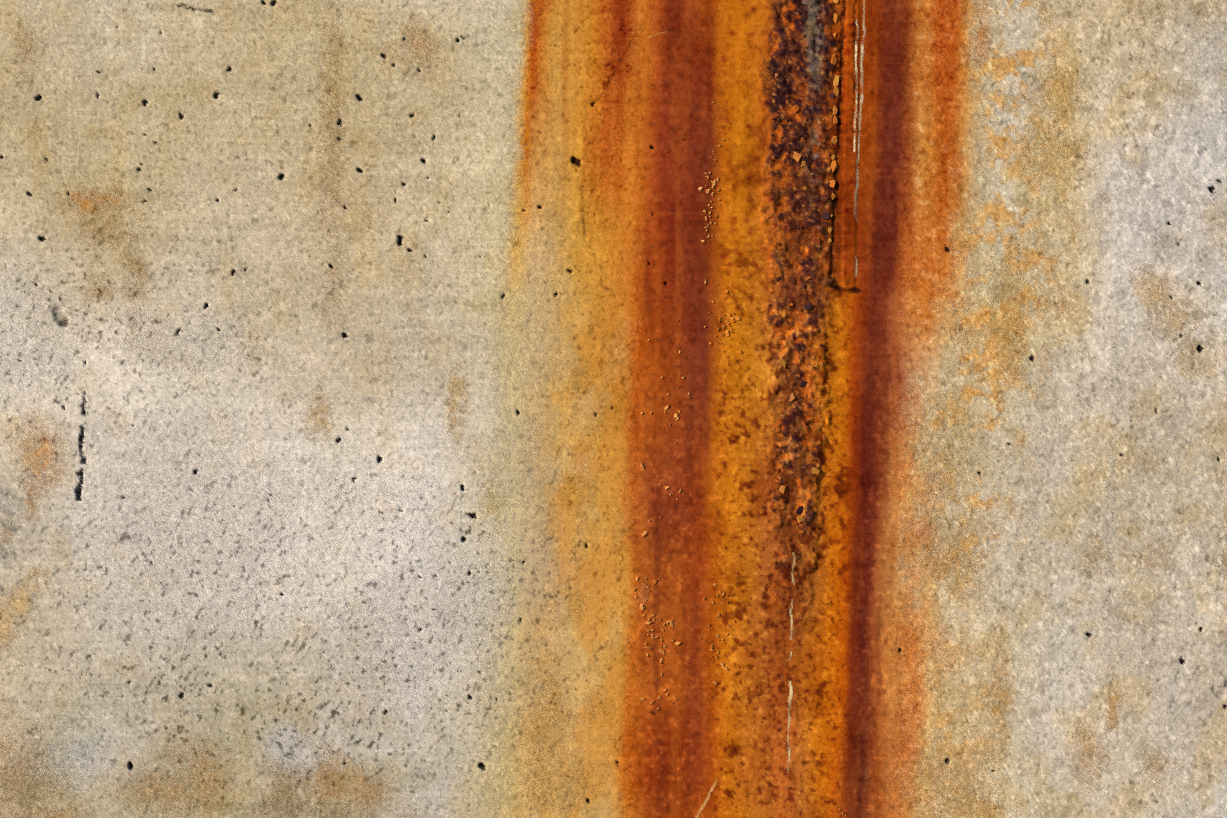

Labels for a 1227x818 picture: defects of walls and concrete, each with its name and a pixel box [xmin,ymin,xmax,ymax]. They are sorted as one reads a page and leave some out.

rust [443,0,1097,818]